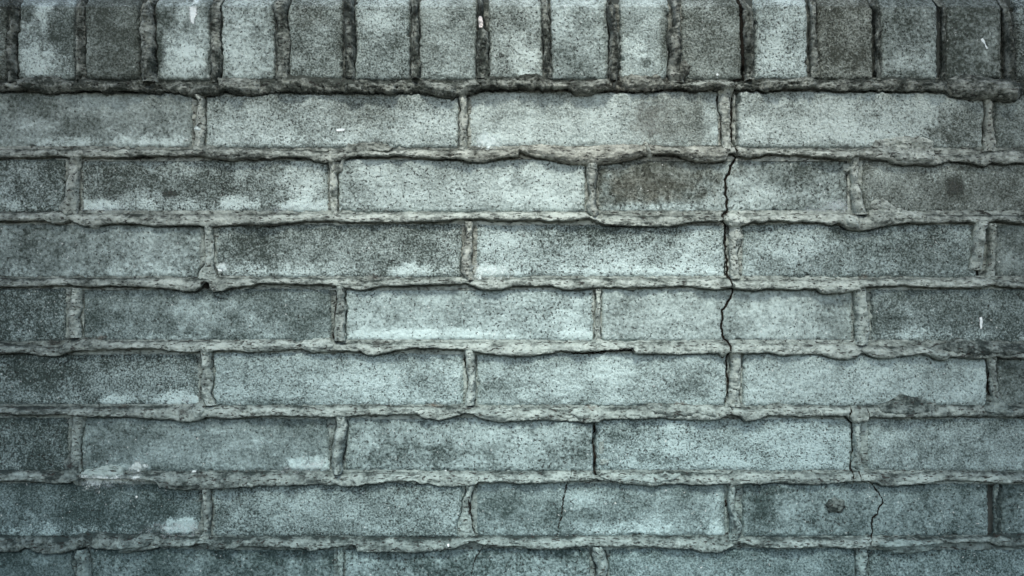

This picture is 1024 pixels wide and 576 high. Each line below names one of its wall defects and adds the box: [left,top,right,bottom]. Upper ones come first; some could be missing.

crack [716,0,745,409]
crack [557,424,597,535]
crack [847,406,884,576]